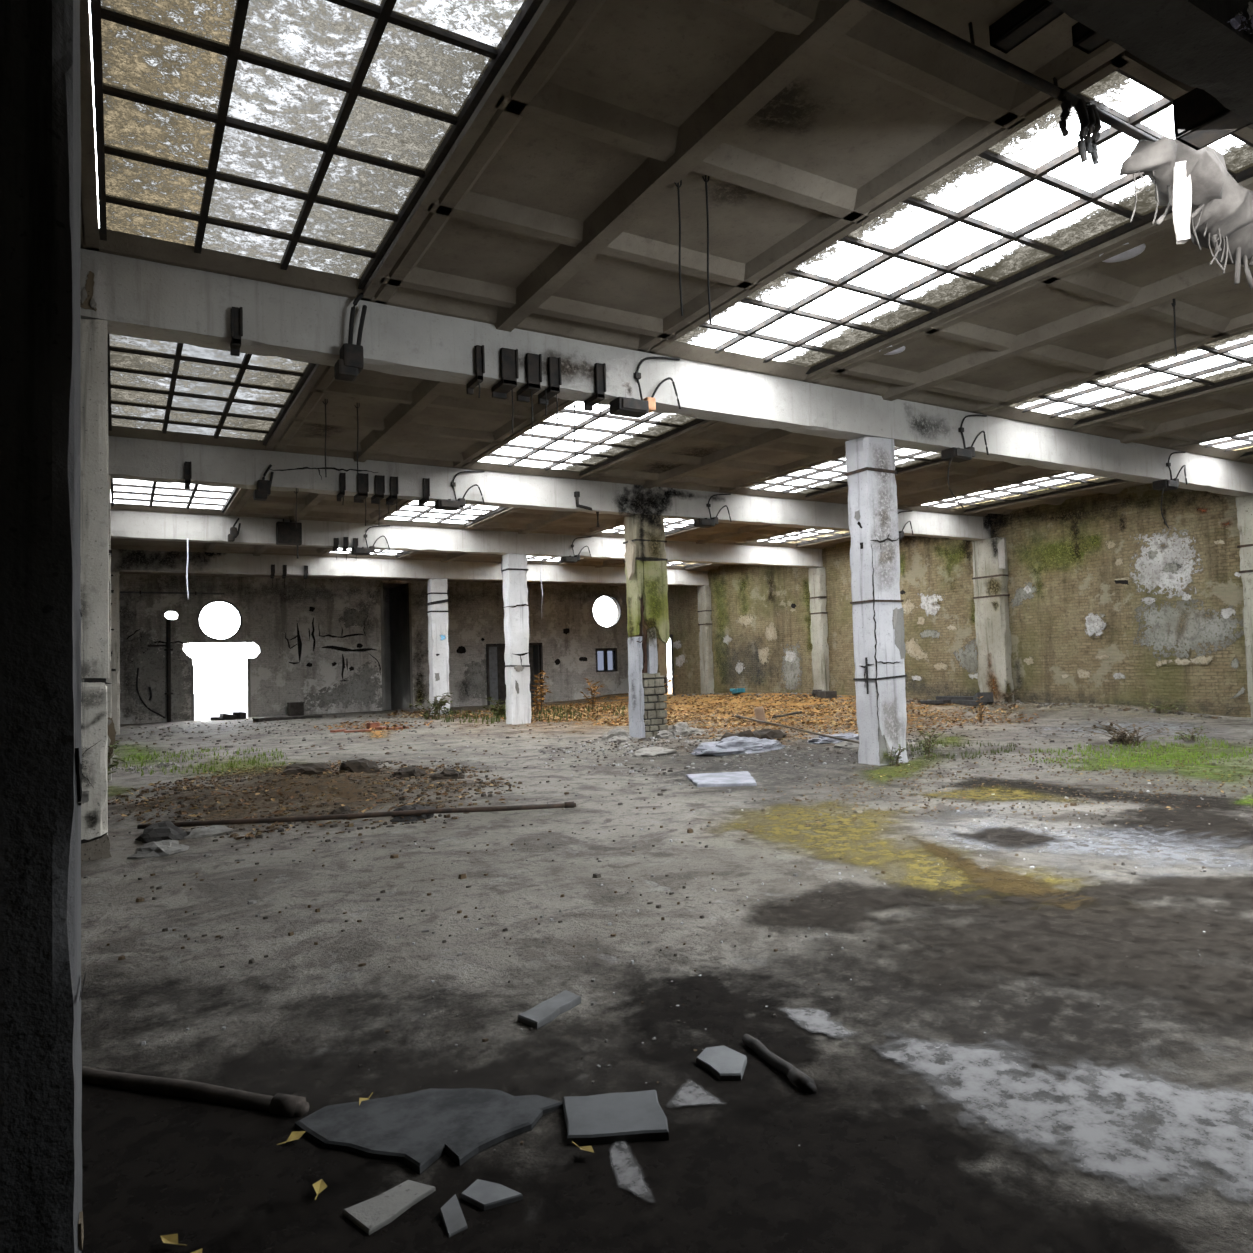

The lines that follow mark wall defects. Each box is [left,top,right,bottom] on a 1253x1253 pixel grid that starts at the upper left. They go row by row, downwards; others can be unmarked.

peeling [1227,2,1253,31]
leakage [990,492,1219,557]
leakage [880,536,949,576]
flaking render [1103,526,1244,669]
flaking render [892,590,978,681]
flaking render [1085,613,1107,637]
leakage [723,646,778,683]